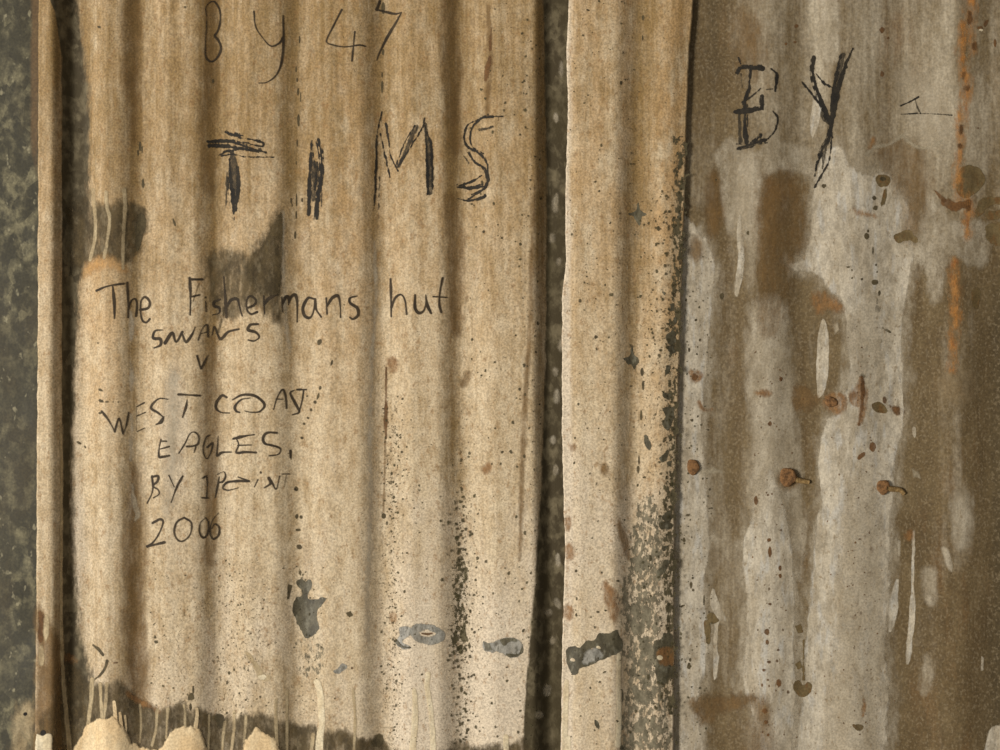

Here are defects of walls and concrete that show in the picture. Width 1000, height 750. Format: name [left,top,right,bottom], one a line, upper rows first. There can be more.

rust [956,0,976,182]
peeling [566,136,1000,750]
rust [792,376,903,426]
leakage [207,560,321,714]
peeling [287,570,326,677]
leakage [379,396,427,743]
peeling [395,624,445,649]
peeling [483,638,523,658]